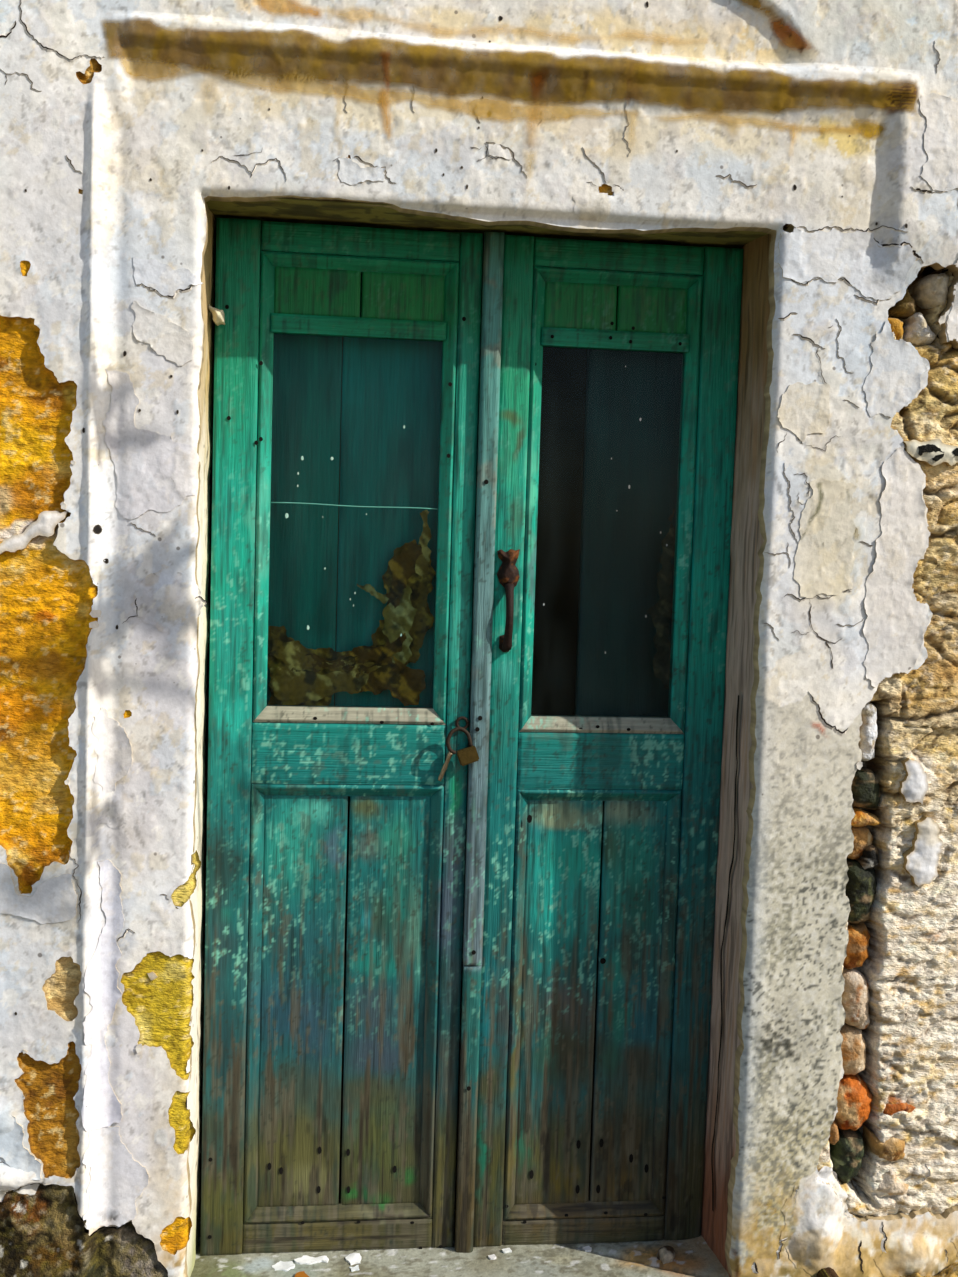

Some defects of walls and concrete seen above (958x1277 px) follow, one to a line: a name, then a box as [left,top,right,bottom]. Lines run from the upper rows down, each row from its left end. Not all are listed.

crack [0,0,104,92]
flaking render [76,59,102,84]
damp [104,18,917,138]
damp [740,0,782,23]
crack [797,225,923,263]
crack [136,283,193,299]
crack [763,274,890,668]
flaking render [0,315,101,924]
crack [809,693,848,736]
flaking render [775,222,958,1217]
flaking render [171,850,201,908]
flaking render [0,859,196,1277]